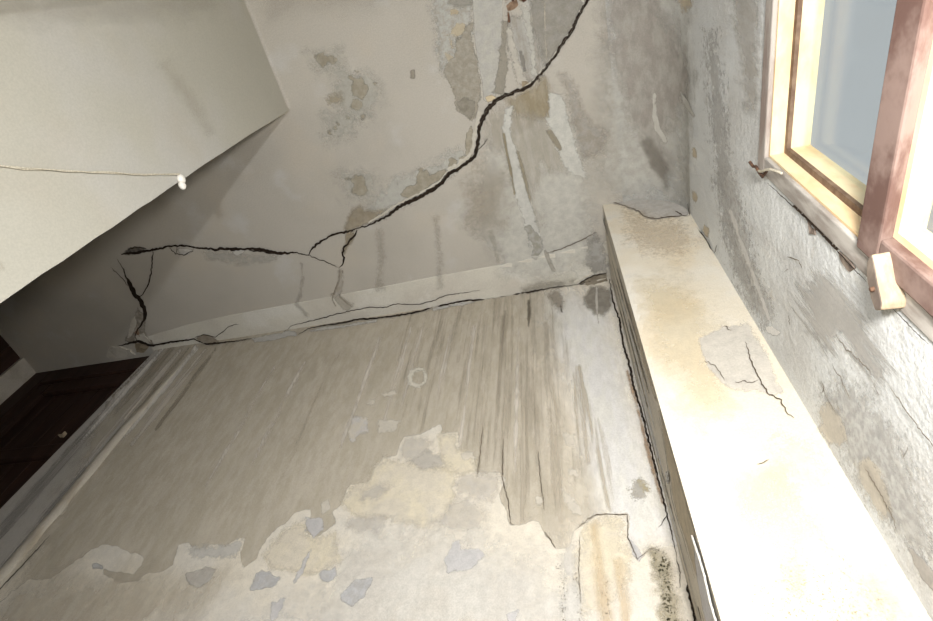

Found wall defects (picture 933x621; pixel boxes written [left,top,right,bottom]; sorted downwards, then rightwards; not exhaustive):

peeling [314,52,378,115]
crack [112,0,590,347]
damp [32,0,680,621]
peeling [342,0,496,211]
flaking render [506,0,526,11]
damp [610,0,694,179]
peeling [700,32,783,395]
peeling [0,424,666,621]
crack [285,264,697,621]